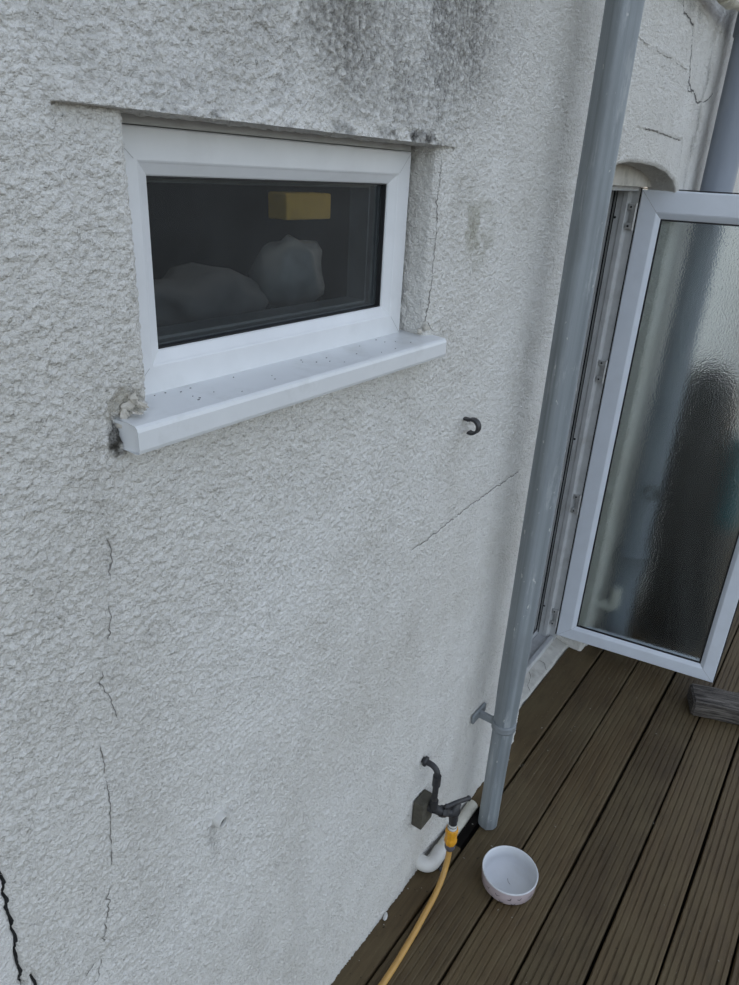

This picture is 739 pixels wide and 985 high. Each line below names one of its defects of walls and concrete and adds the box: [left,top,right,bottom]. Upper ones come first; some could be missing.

crack [683,5,713,104]
spalling [109,389,149,456]
crack [0,872,37,985]